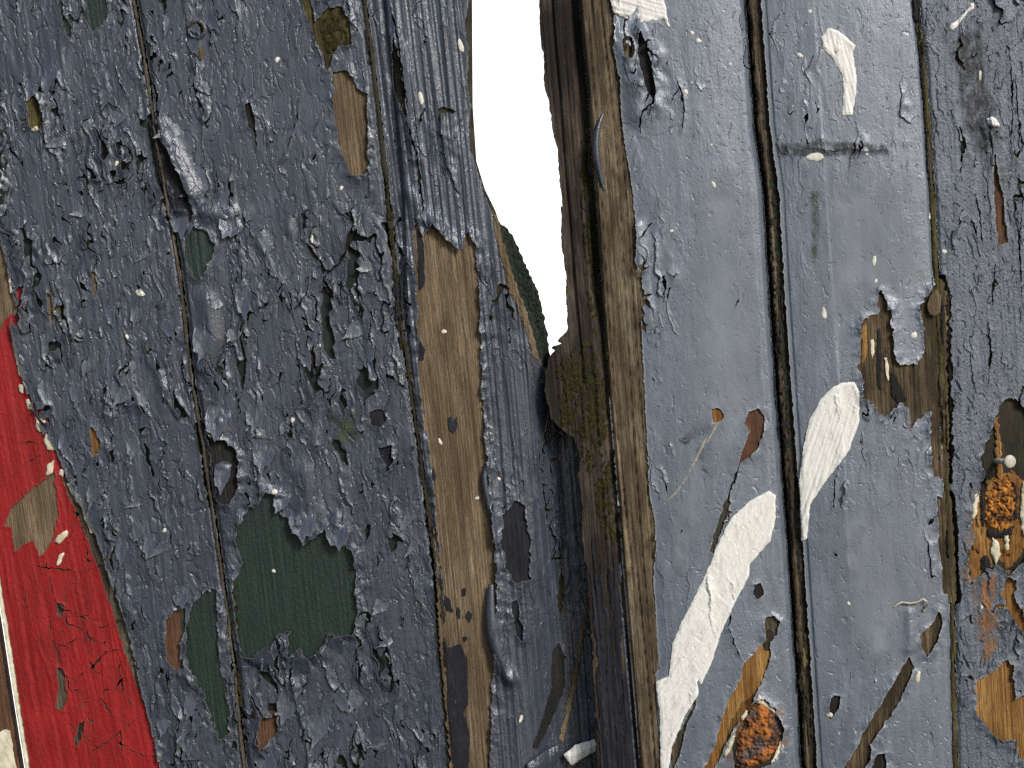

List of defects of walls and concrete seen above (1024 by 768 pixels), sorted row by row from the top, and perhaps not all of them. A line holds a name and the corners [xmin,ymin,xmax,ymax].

peeling [291,0,418,188]
peeling [4,473,172,710]
crack [24,507,154,762]
peeling [154,404,390,768]
peeling [402,210,542,768]
peeling [699,488,740,564]
peeling [728,399,775,476]
peeling [818,274,1024,768]
rust [980,476,1016,533]